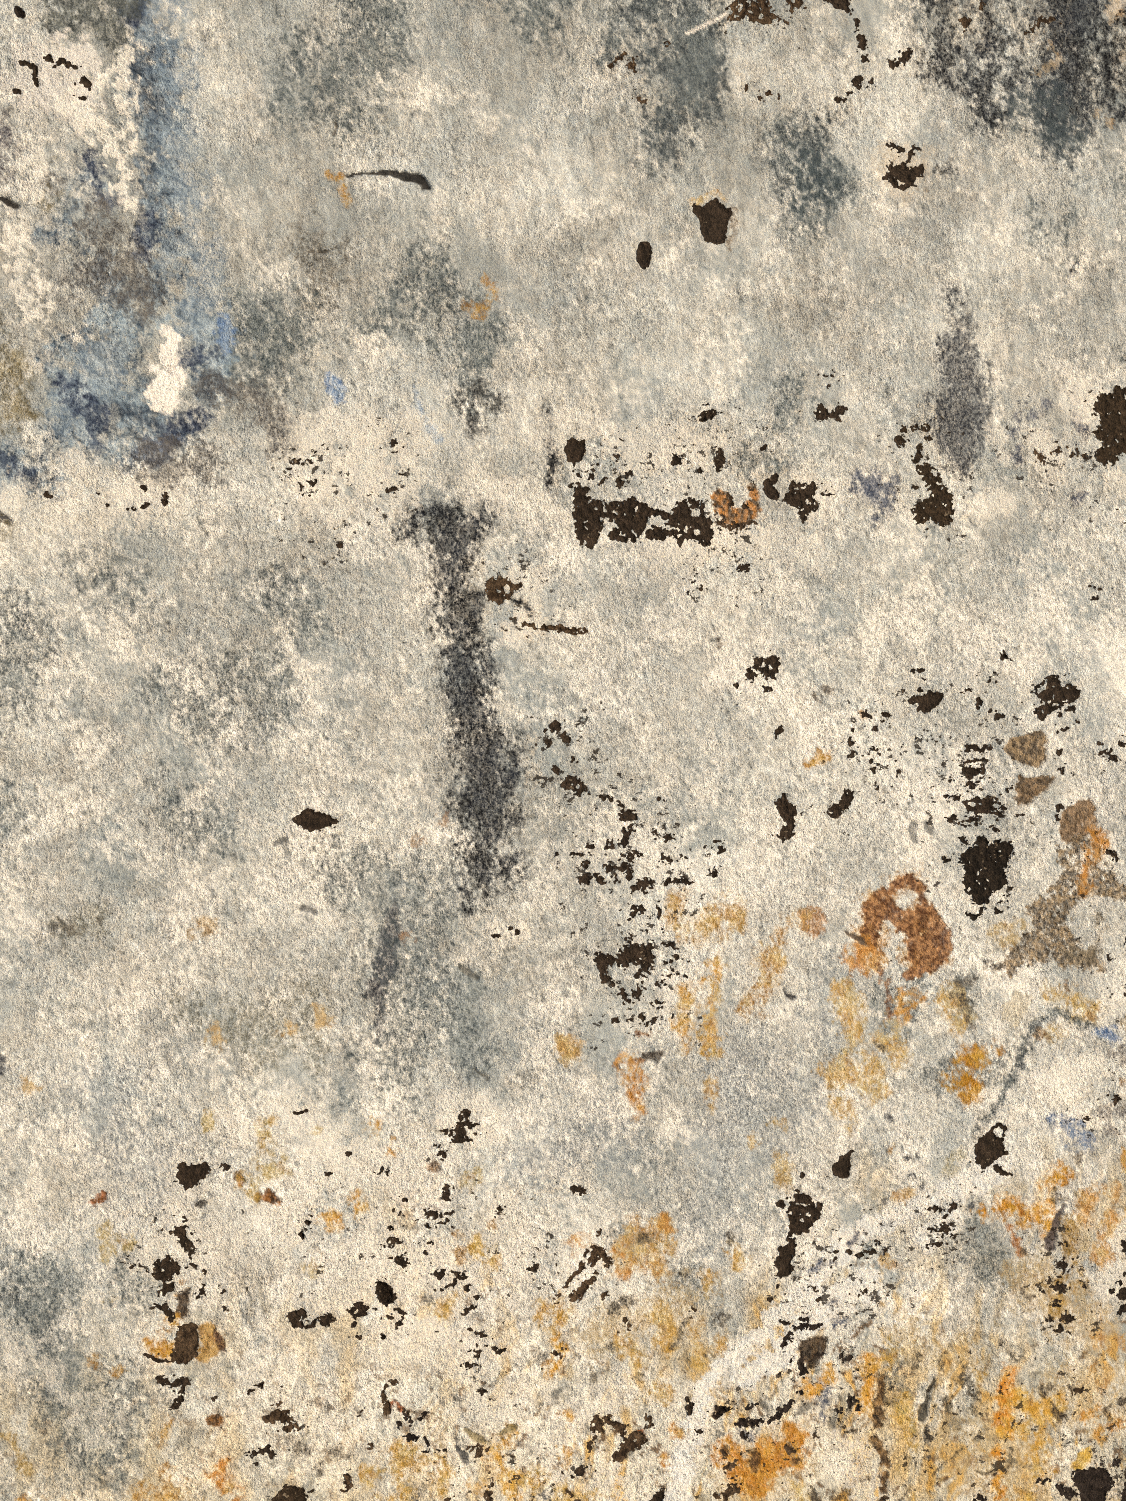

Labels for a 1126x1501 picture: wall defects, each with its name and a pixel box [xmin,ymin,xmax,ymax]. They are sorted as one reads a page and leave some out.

peeling [562,403,758,595]
peeling [894,417,955,530]
water stain [917,273,1100,526]
water stain [1101,463,1126,502]
water stain [0,223,1036,1501]
peeling [531,720,726,1034]
rust [611,1029,653,1126]
rust [657,861,1006,1139]
peeling [766,650,1126,996]
water stain [998,1047,1108,1131]
rust [1075,817,1116,901]
rust [704,1146,1126,1501]